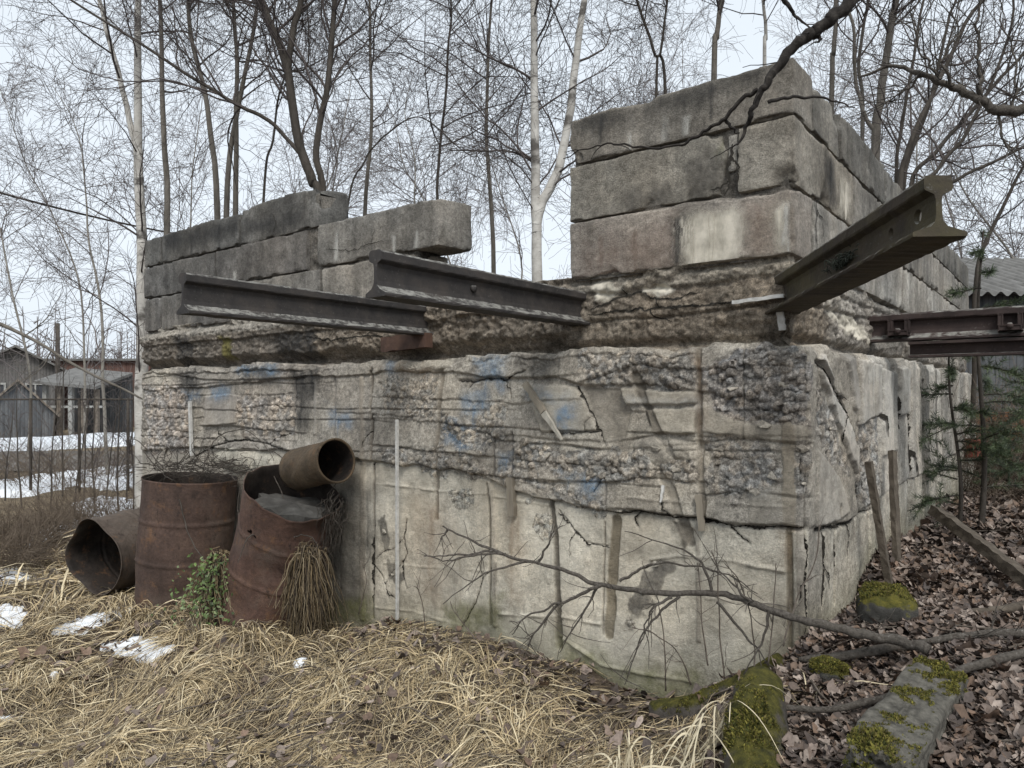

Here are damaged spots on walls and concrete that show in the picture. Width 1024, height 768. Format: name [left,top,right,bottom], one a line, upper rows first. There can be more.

crack [711,144,740,196]
crack [542,386,607,491]
spalling [376,341,881,541]
crack [610,480,870,633]